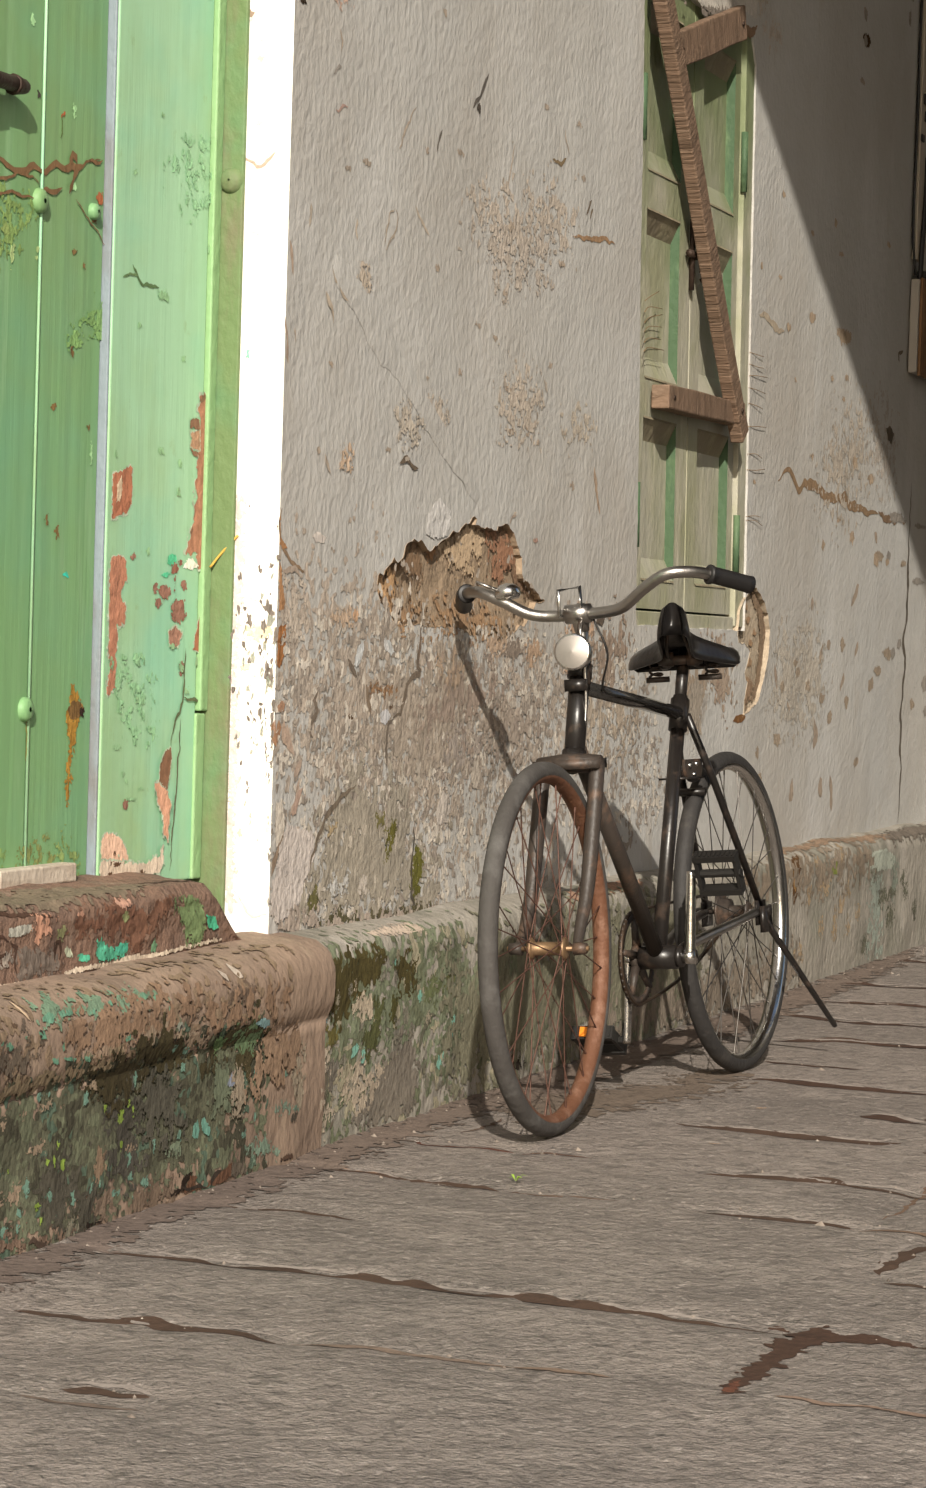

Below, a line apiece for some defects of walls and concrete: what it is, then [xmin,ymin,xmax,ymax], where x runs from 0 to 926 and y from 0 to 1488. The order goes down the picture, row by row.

spalling [377,516,545,665]
spalling [733,588,770,723]
crack [778,467,911,815]
spalling [271,701,312,746]
spalling [369,679,440,743]
spalling [261,802,285,848]
damp [0,893,295,1085]
damp [351,1025,424,1132]
damp [93,1145,176,1224]